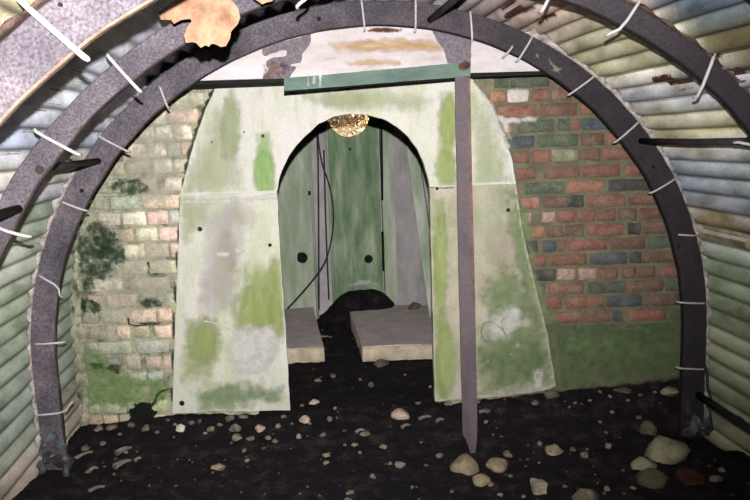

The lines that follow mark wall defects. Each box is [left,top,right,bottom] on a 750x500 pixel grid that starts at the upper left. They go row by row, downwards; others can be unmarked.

corrosion [501,0,534,18]
peeling [262,34,311,79]
corrosion [652,74,693,90]
water stain [442,99,456,142]
water stain [181,153,276,203]
water stain [436,152,455,183]
water stain [518,28,714,407]
water stain [229,275,282,373]
hole [129,389,169,421]